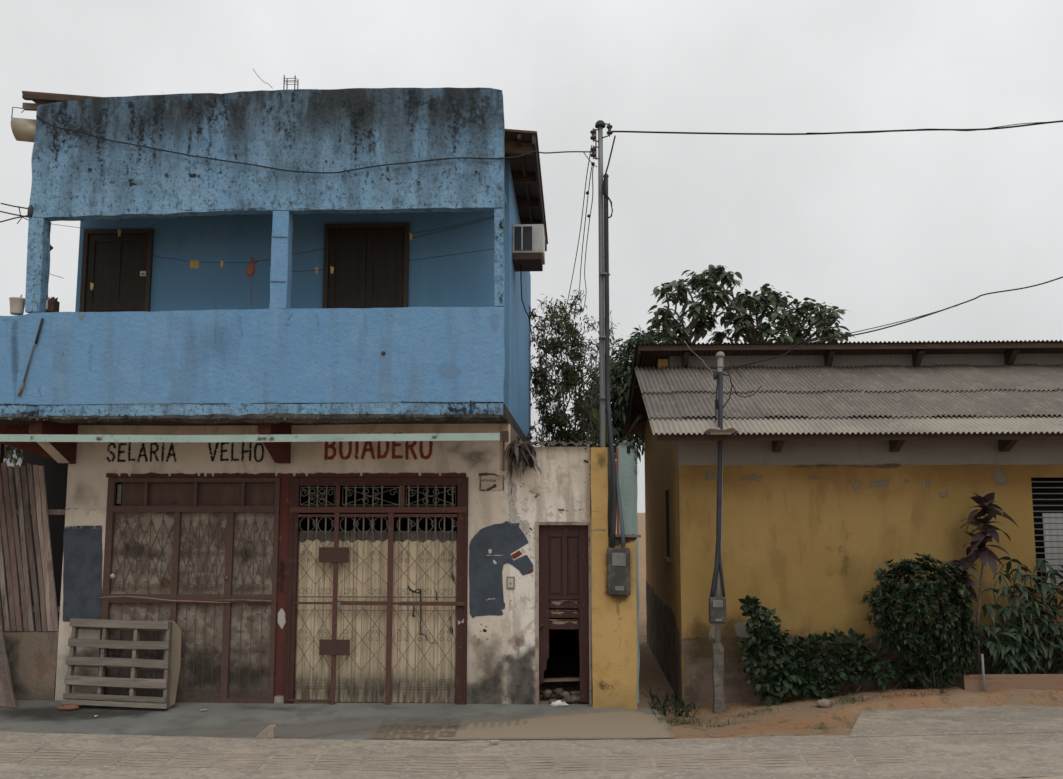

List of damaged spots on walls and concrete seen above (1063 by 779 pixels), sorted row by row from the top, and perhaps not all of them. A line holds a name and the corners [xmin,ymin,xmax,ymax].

leakage [43,103,114,183]
leakage [125,99,167,187]
leakage [187,95,241,179]
leakage [339,101,421,183]
leakage [405,90,490,153]
spalling [0,412,510,424]
leakage [467,639,535,704]